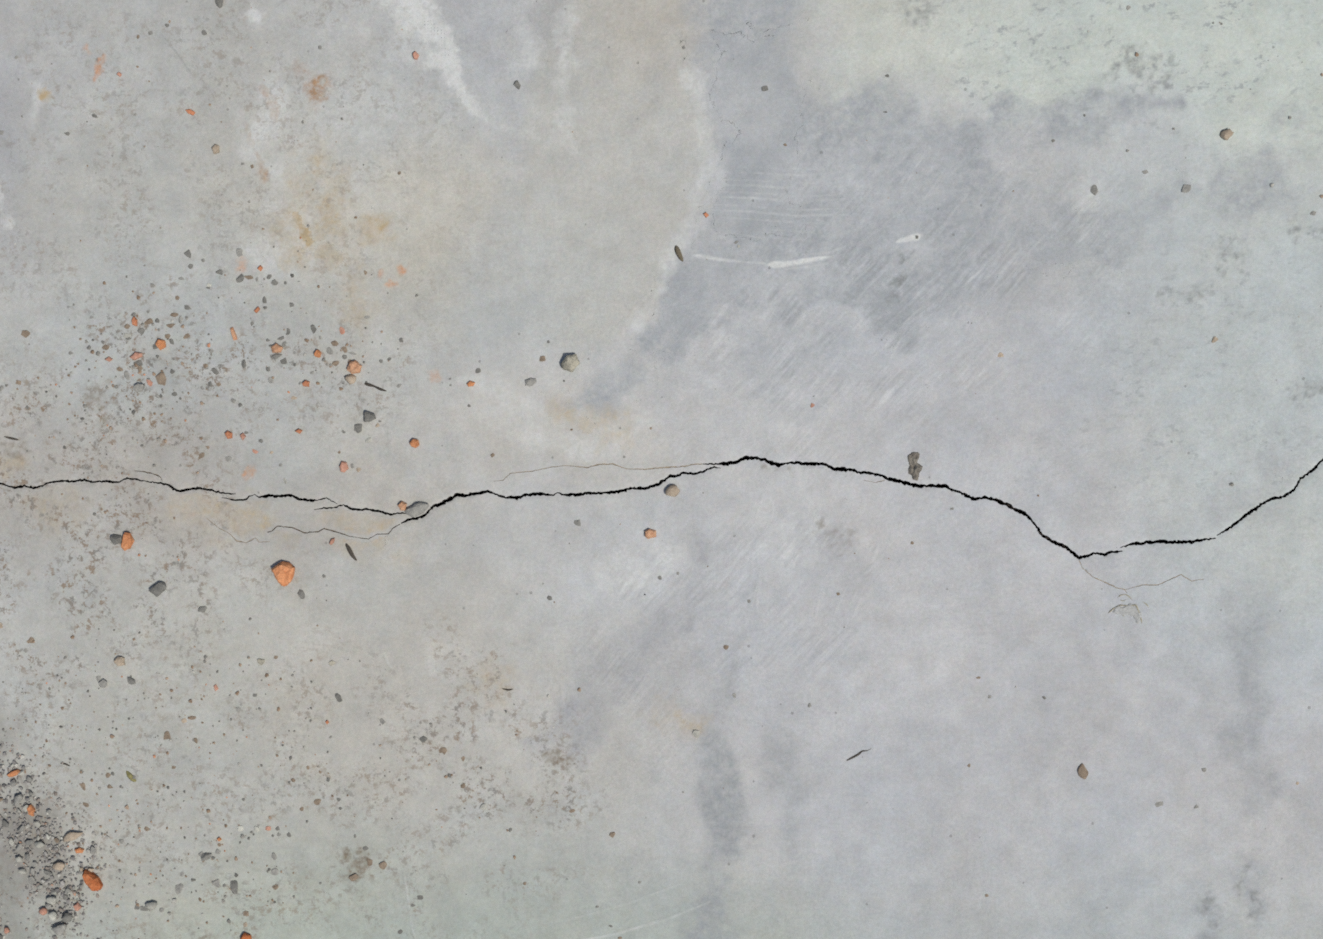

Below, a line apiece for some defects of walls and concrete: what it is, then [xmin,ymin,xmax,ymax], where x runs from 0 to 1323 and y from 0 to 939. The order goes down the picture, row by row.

crack [0,455,1323,593]